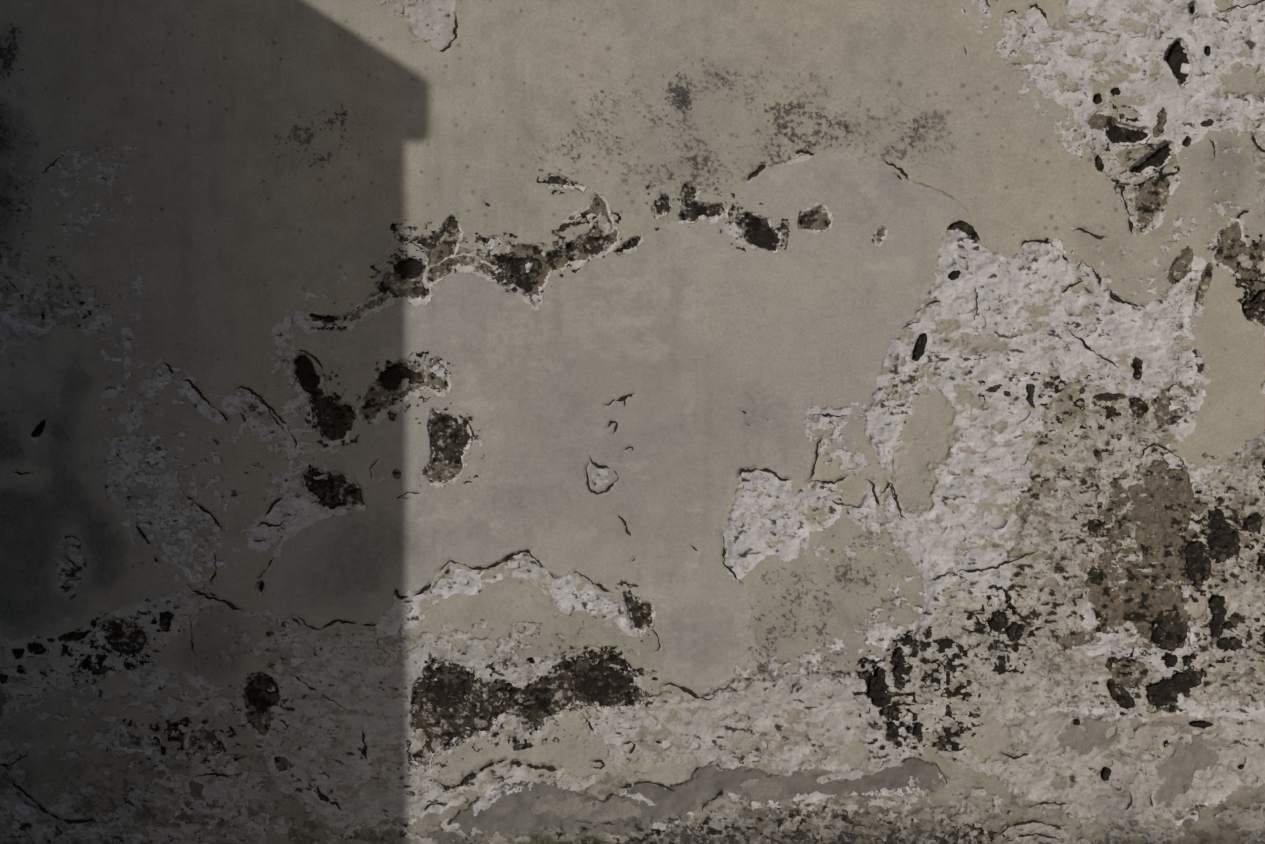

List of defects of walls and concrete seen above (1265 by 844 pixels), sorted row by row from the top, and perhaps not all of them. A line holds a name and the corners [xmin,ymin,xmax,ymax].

peeling [380,0,460,52]
peeling [992,0,1265,237]
spalling [536,169,586,195]
spalling [645,194,673,219]
peeling [1070,226,1109,252]
peeling [0,242,119,355]
peeling [118,358,229,433]
spalling [31,420,45,444]
peeling [54,533,88,600]
peeling [1209,803,1265,844]